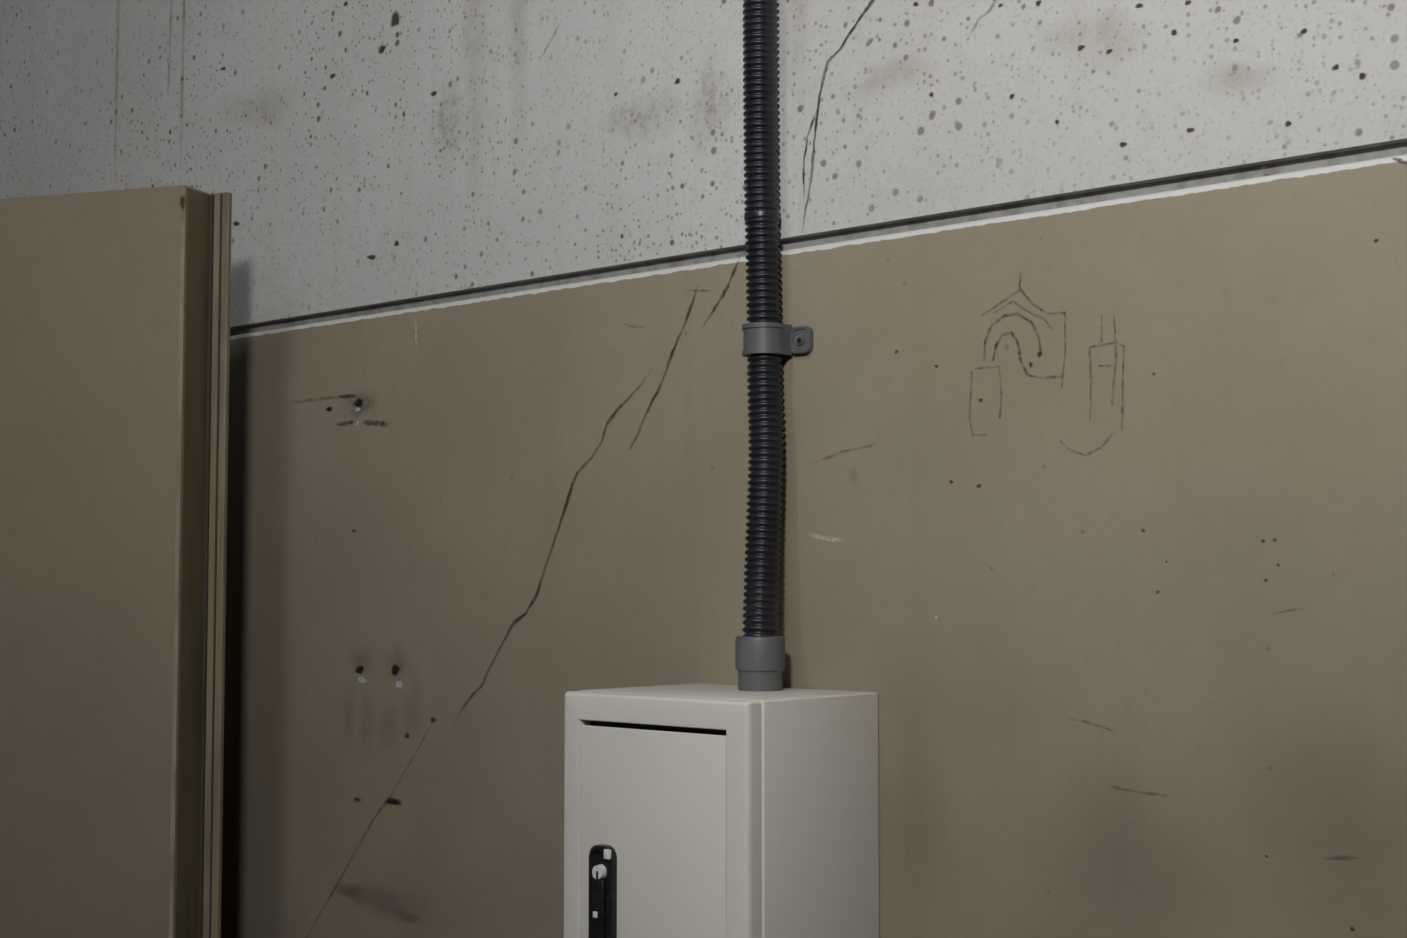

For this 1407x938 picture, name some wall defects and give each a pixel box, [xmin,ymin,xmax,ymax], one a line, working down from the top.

crack [803,0,874,224]
crack [552,265,737,546]
crack [503,581,541,642]